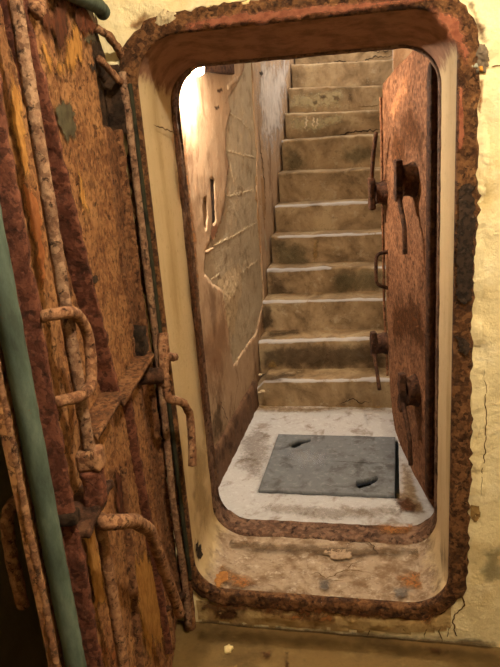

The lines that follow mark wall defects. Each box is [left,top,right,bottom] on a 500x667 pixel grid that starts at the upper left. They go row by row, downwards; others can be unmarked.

water stain [259,60,288,144]
corrosion [391,109,423,161]
peeling [203,63,267,363]
corrosion [174,115,210,436]
corrosion [393,299,423,346]
corrosion [379,524,414,534]
corrosion [214,566,254,588]
corrosion [135,550,165,659]
crack [424,597,465,640]